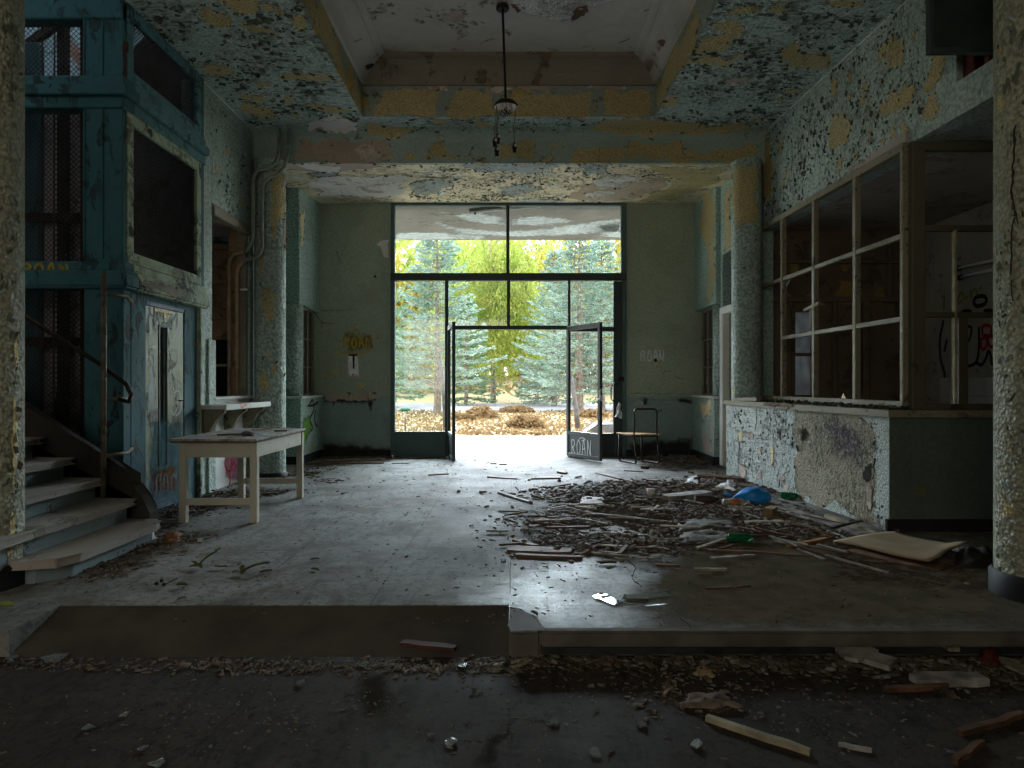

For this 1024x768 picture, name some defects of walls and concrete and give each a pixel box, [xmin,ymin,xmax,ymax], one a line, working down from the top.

peeling [0,144,23,556]
peeling [136,0,946,304]
peeling [734,405,883,524]
crack [1010,125,1019,301]